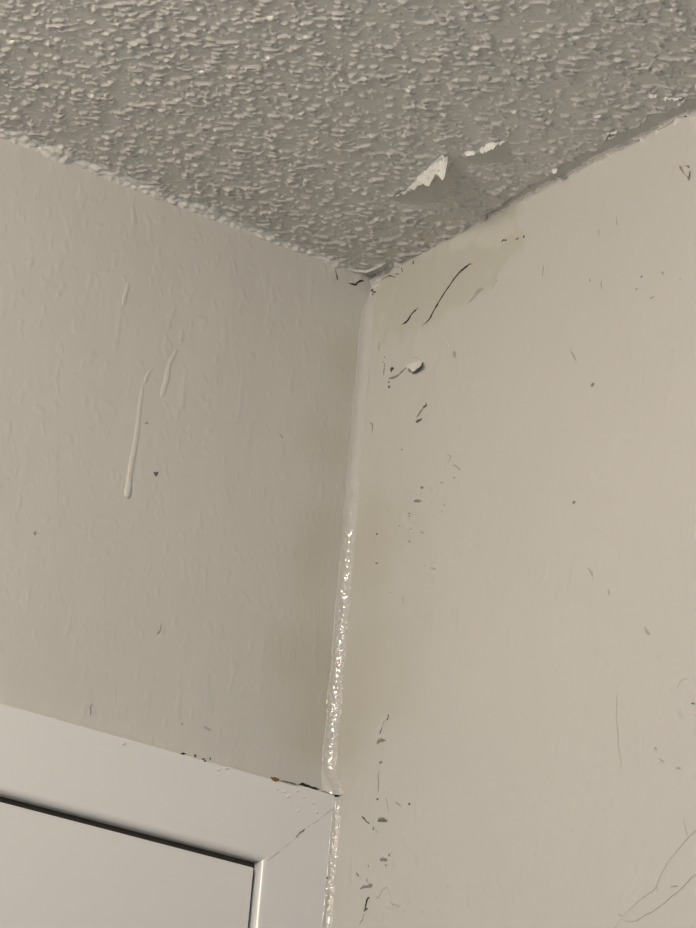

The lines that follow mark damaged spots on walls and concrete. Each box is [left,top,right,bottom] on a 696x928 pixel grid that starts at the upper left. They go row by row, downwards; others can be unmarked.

peeling [463,141,505,156]
peeling [394,154,448,197]
crack [402,260,470,328]
peeling [387,356,423,390]